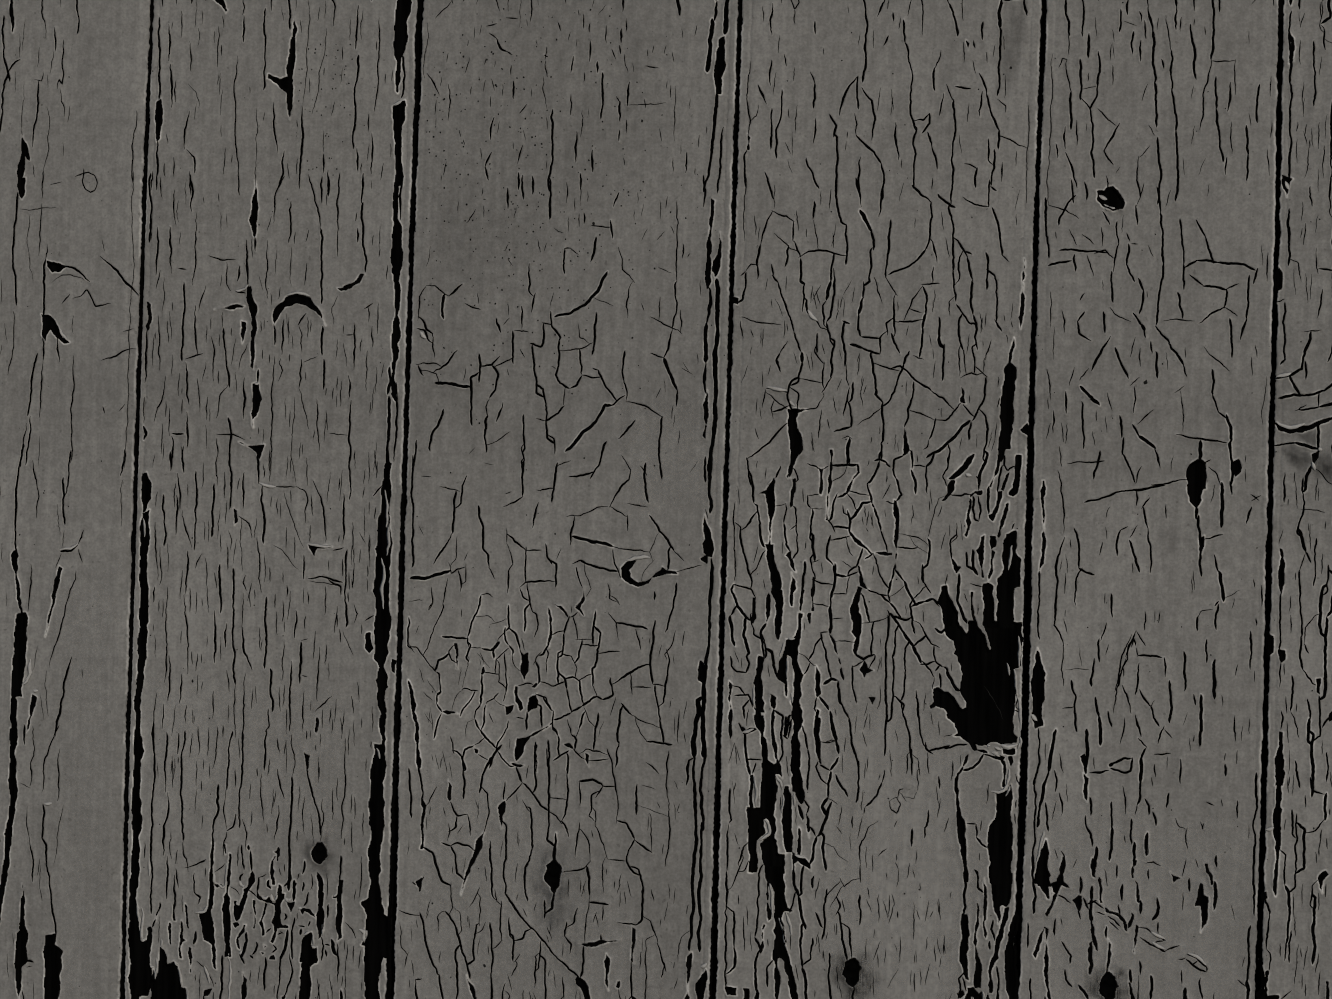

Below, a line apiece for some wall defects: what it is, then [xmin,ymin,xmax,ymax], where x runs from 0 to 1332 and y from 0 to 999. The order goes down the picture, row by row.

peeling [997,0,1028,96]
peeling [128,473,344,999]
crack [399,0,1332,999]
peeling [728,259,1103,999]